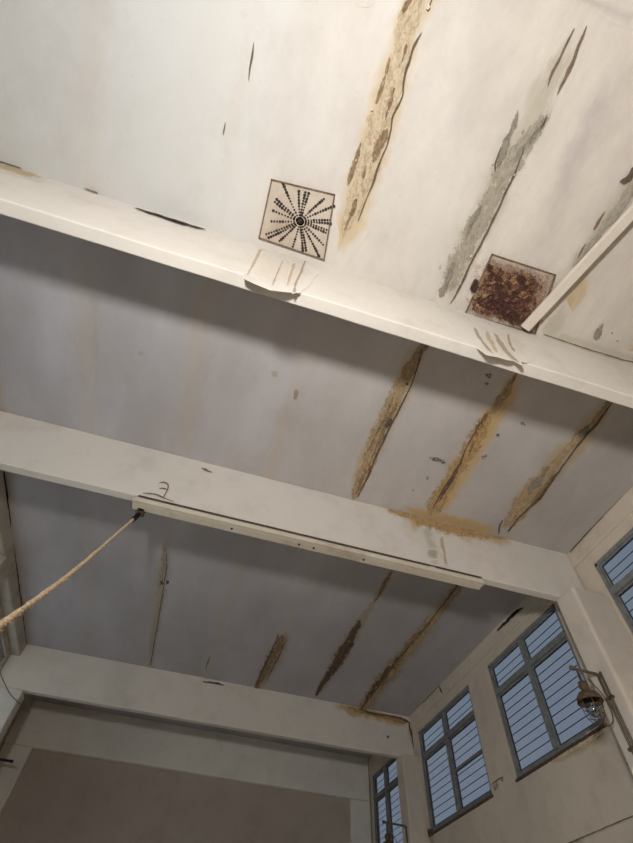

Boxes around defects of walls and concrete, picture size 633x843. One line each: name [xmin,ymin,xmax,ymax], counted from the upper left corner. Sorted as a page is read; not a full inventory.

crack [136,208,204,229]
spalling [334,0,447,264]
spalling [429,20,588,309]
spalling [561,155,633,275]
rust [466,259,552,365]
spalling [346,339,435,502]
spalling [371,370,618,568]
spalling [251,627,296,689]
spalling [312,569,396,699]
spalling [333,583,468,738]